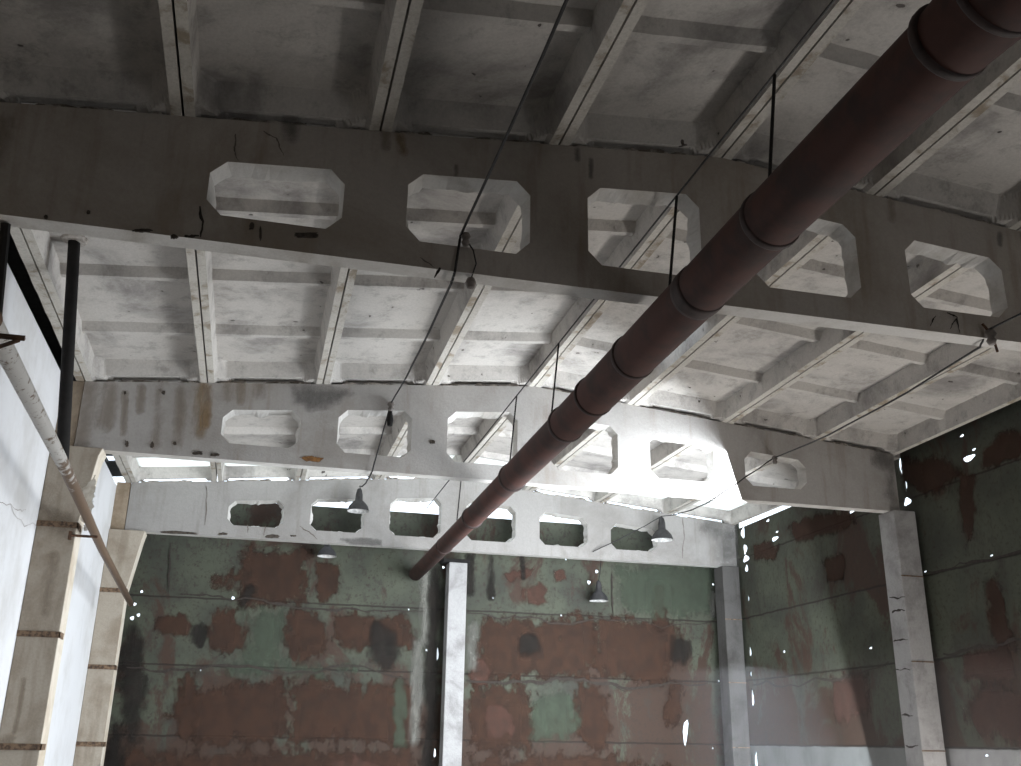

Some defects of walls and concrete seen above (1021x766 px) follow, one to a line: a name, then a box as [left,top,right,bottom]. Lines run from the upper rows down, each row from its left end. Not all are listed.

corrosion [753,541,780,562]
corrosion [788,510,857,542]
corrosion [901,428,1021,541]
corrosion [154,544,416,670]
corrosion [464,568,692,766]
corrosion [984,578,1017,662]
corrosion [120,671,426,766]